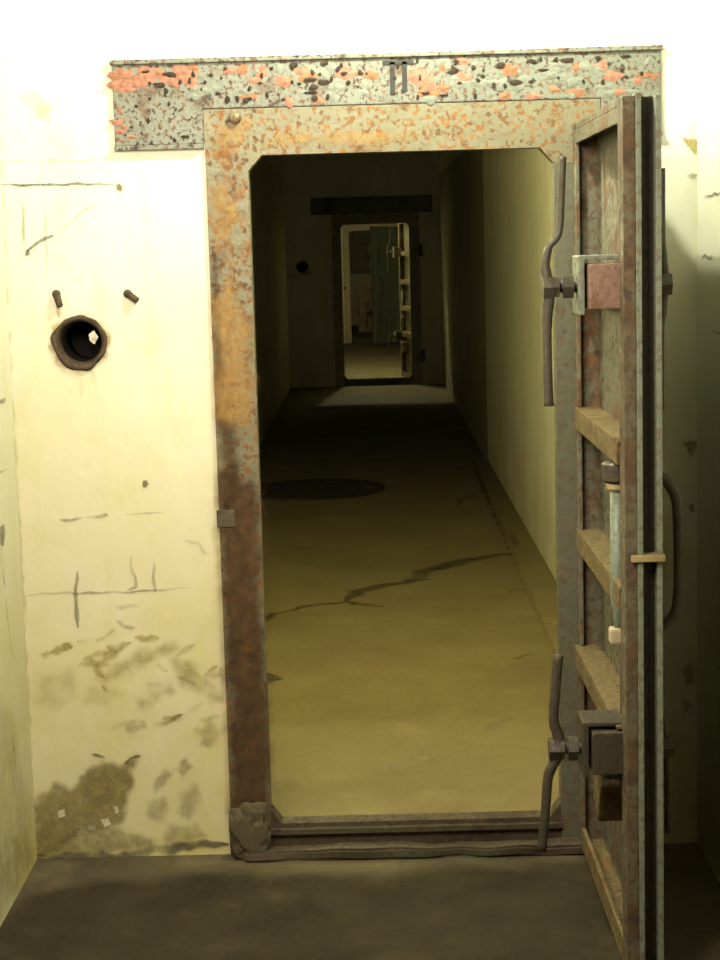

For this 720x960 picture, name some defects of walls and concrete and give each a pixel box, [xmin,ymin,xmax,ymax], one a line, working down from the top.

corrosion [214,332,269,808]
crack [265,460,522,621]
flaking render [34,754,150,856]